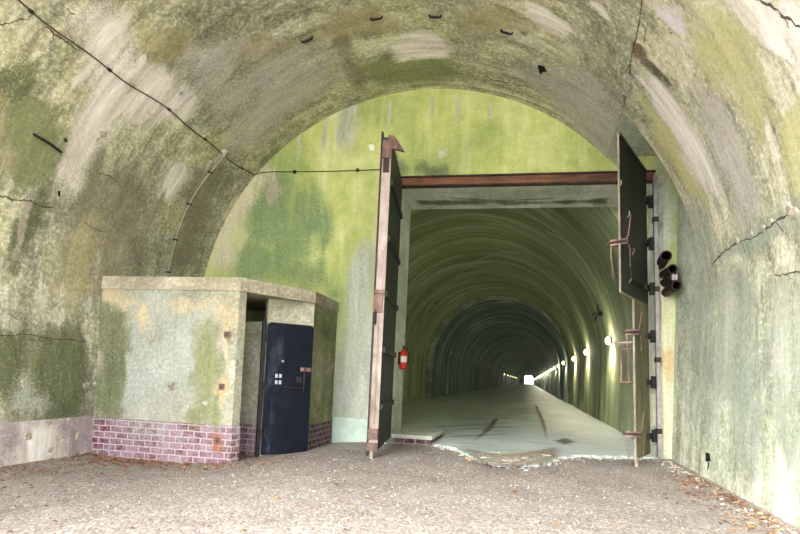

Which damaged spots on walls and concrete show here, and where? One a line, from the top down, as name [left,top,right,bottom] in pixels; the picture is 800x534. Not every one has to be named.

crack [756,0,800,28]
crack [622,0,646,75]
rust [630,40,669,82]
crack [0,195,57,210]
water stain [7,0,377,418]
crack [714,202,800,262]
crack [0,326,88,342]